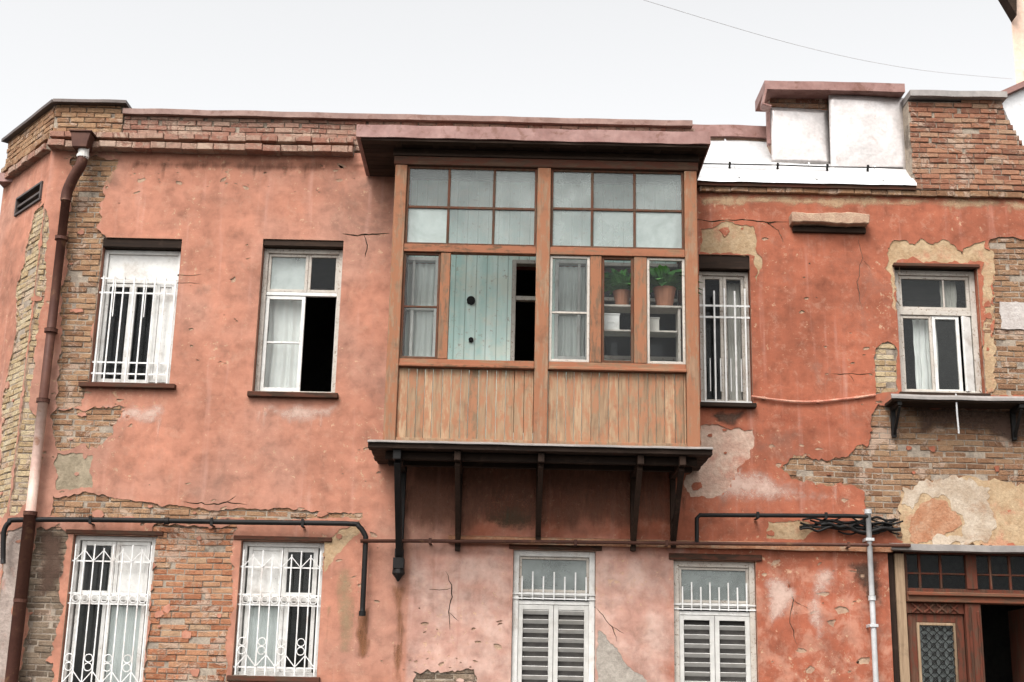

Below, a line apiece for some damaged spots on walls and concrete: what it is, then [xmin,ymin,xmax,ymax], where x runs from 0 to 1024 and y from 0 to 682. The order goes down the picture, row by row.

flaking render [700,220,781,281]
spalling [885,237,1024,396]
spalling [0,152,378,682]
flaking render [684,424,755,498]
spalling [764,342,1024,553]
crack [429,572,457,624]